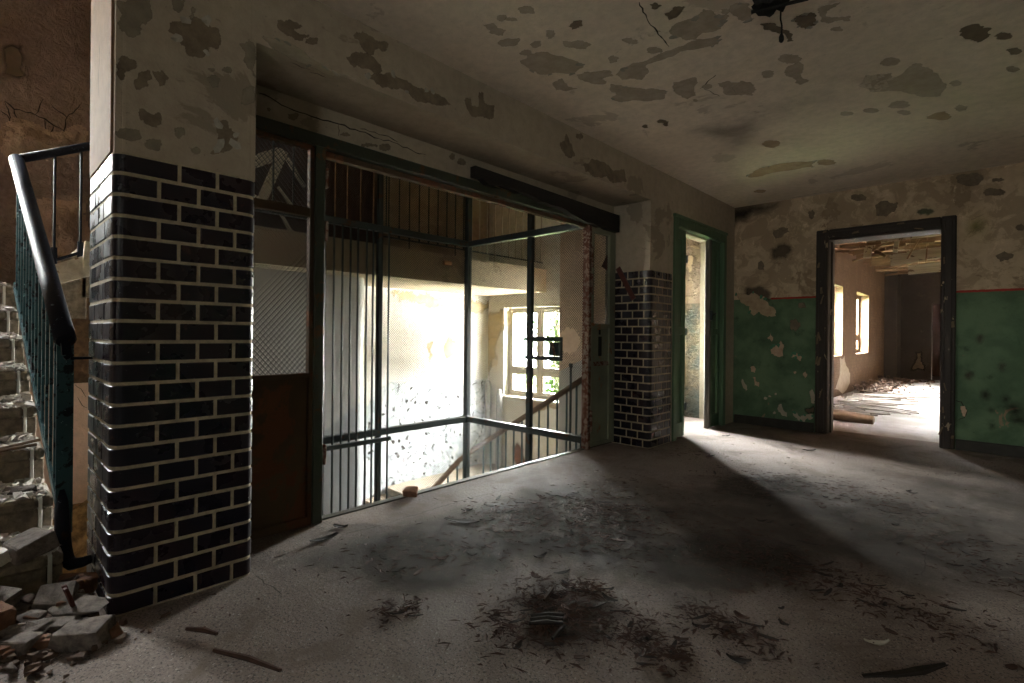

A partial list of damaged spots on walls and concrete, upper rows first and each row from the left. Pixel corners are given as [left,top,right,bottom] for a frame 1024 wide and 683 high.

crack [1,100,80,132]
peeling [168,0,232,88]
crack [259,93,425,155]
flaking render [347,31,451,106]
crack [639,2,668,45]
peeling [484,2,851,102]
peeling [841,57,961,116]
peeling [959,24,1022,72]
peeling [746,159,836,178]
flaking render [735,291,776,317]
peeling [768,333,807,378]
flaking render [741,355,850,422]